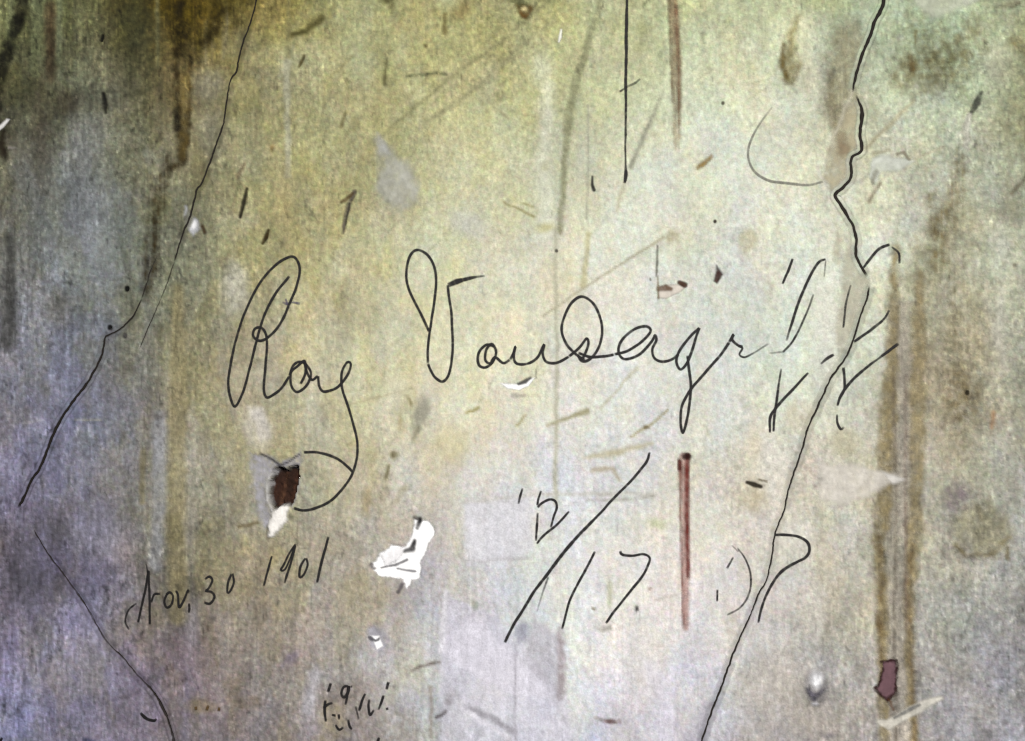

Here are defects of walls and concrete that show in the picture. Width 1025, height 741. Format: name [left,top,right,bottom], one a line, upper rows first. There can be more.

rust [670,0,681,110]
crack [16,0,257,508]
crack [701,0,889,741]
crack [35,532,178,741]
spalling [251,454,300,537]
spalling [371,517,435,593]
rust [678,453,691,629]
spalling [874,659,898,702]
water stain [873,246,925,741]